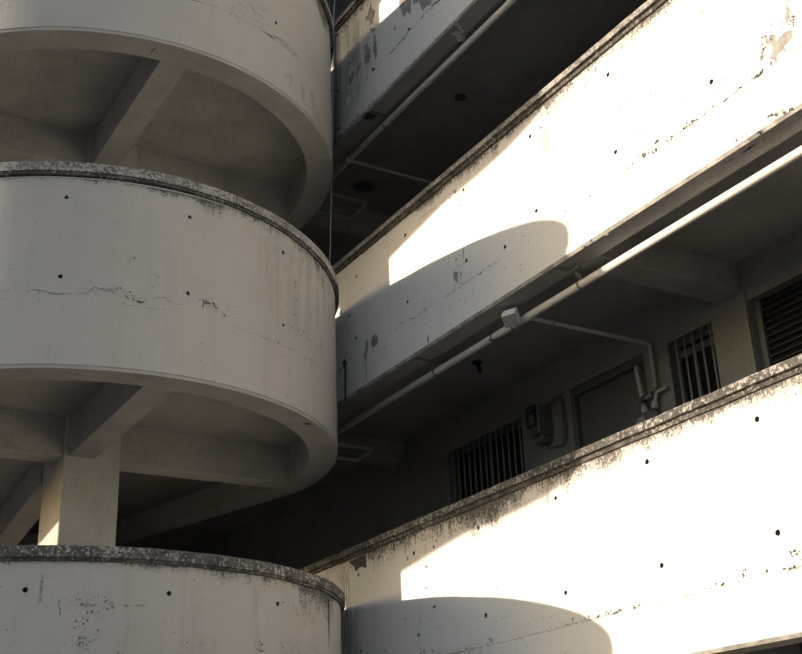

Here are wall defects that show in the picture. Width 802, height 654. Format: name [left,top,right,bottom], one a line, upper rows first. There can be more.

peeling [399,0,432,18]
peeling [756,0,800,65]
crack [542,46,802,231]
crack [7,285,183,307]
water stain [352,373,802,566]
crack [446,563,801,654]